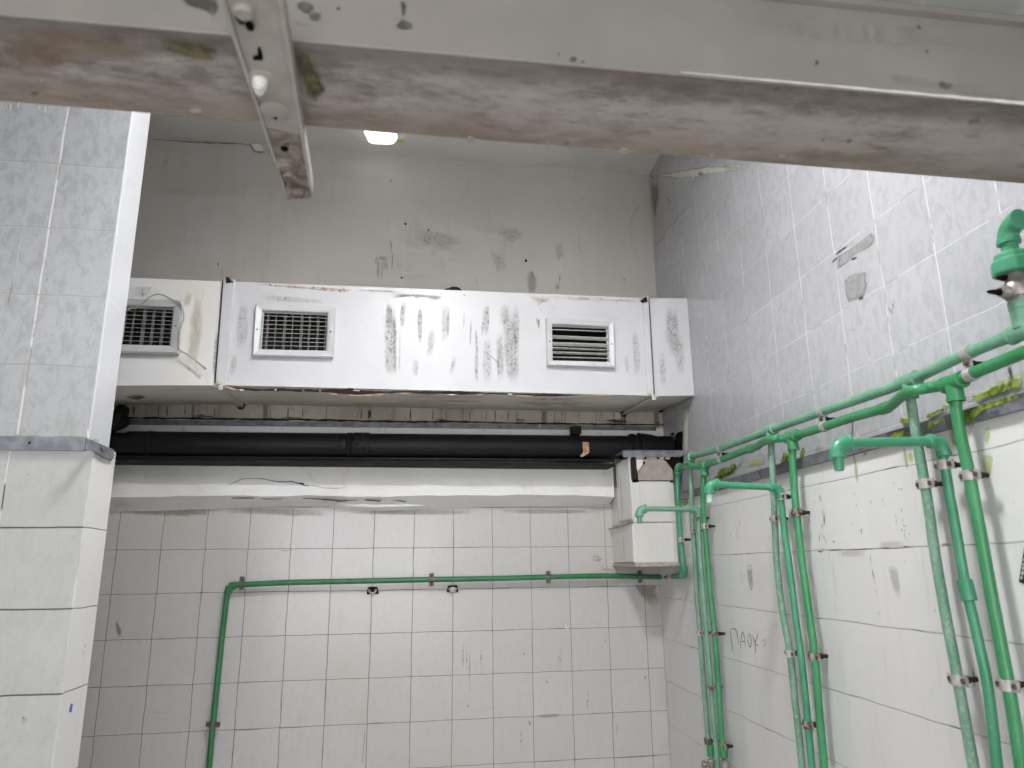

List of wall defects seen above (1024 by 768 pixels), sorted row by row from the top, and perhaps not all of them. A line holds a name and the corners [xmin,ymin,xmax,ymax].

mould [298,55,324,97]
crack [232,478,406,502]
damp [206,209,1024,768]